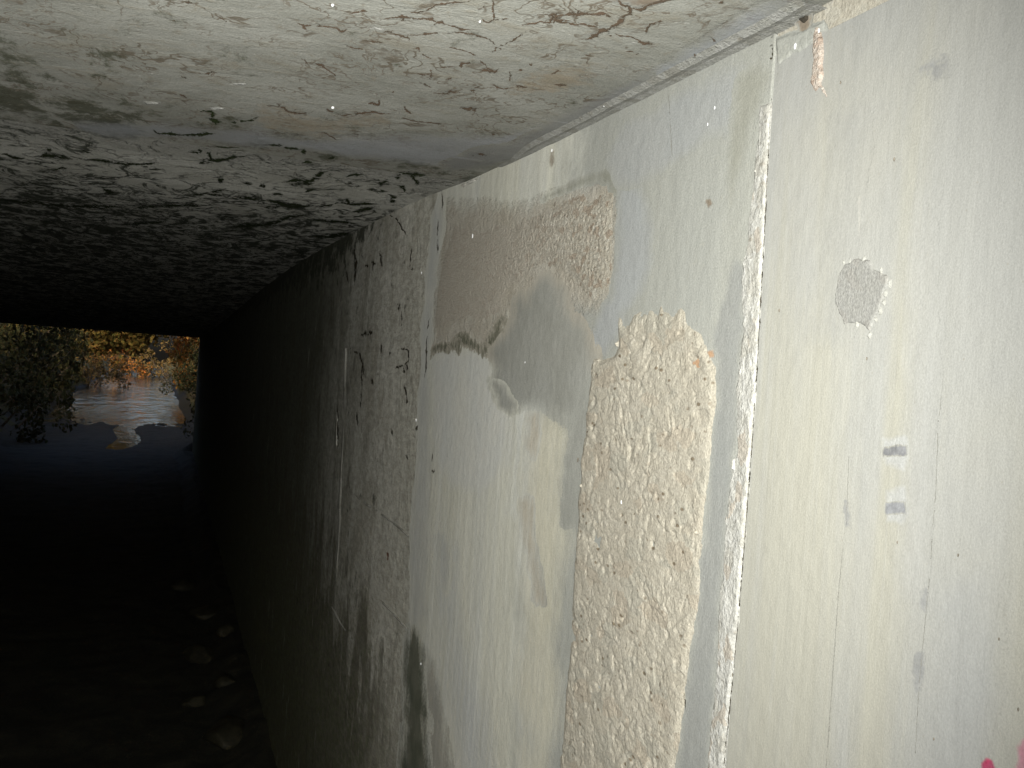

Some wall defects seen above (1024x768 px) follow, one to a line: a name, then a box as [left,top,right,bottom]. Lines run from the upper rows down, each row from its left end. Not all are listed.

crack [0,72,441,239]
crack [298,0,667,111]
damp [430,168,617,768]
spalling [436,190,613,326]
spalling [560,306,716,768]
spalling [708,101,773,768]